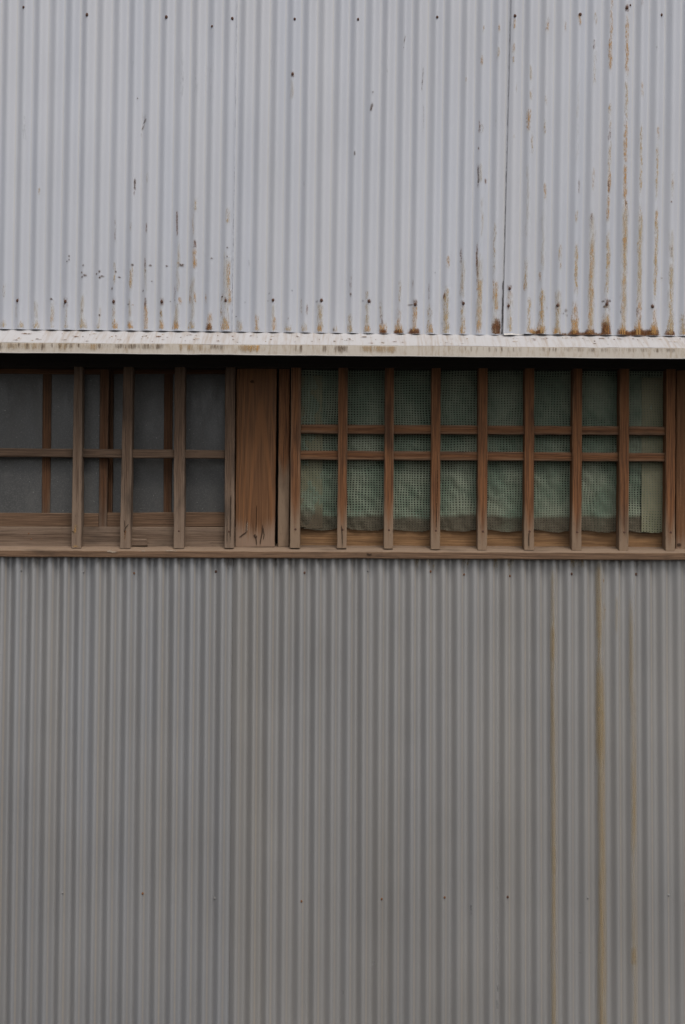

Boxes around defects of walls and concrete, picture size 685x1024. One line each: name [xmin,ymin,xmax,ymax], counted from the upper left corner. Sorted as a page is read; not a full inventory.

corrosion [365,283,433,334]
corrosion [524,91,685,336]